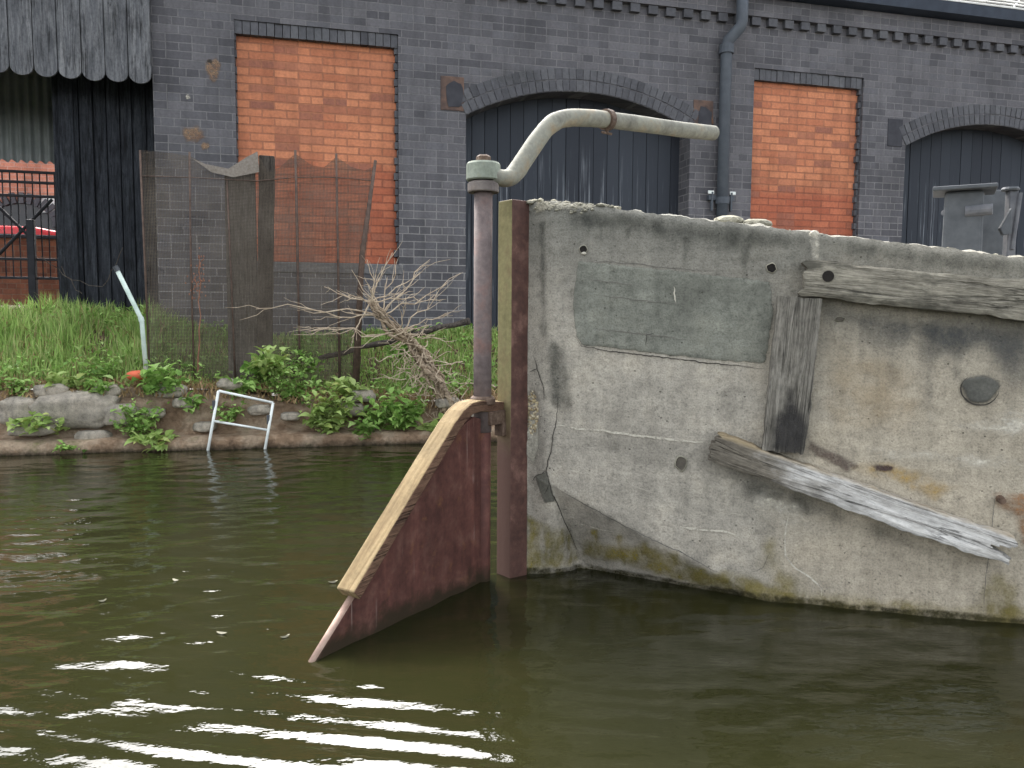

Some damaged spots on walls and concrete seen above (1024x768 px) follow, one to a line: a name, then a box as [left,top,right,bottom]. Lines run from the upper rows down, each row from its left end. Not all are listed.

crack [530,356,726,577]
rust [810,443,855,470]
leakage [527,490,1024,624]